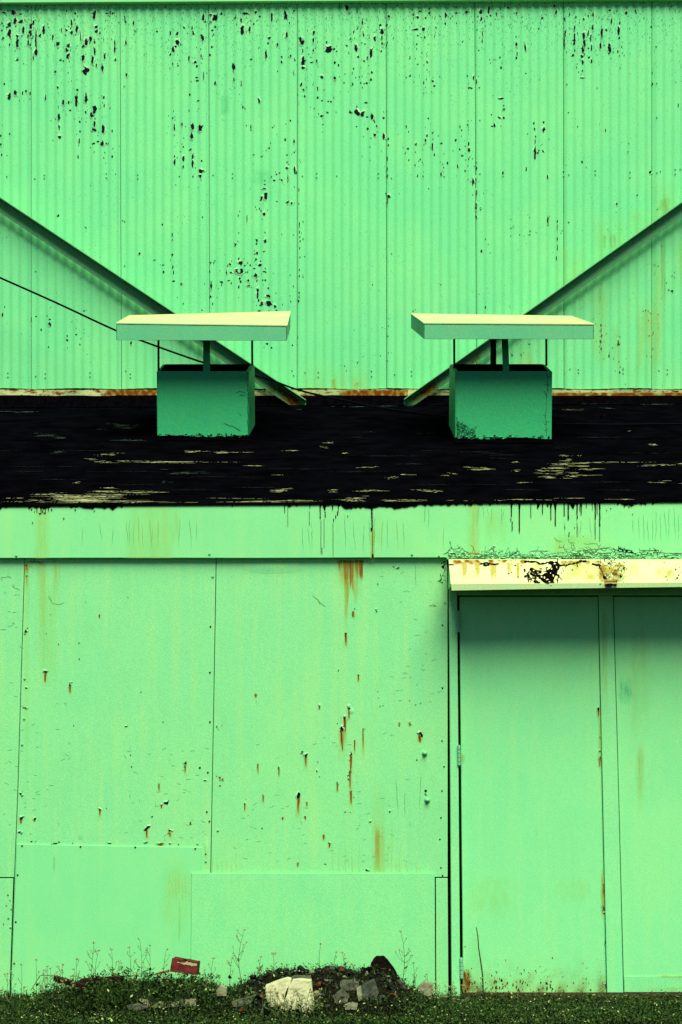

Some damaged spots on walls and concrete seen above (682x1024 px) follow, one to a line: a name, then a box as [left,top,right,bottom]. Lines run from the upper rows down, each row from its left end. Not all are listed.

peeling [0,5,142,164]
peeling [156,5,399,125]
peeling [538,3,641,78]
peeling [168,110,205,187]
peeling [202,139,305,311]
corrosion [270,383,299,405]
corrosion [345,382,437,400]
damp [239,487,404,540]
damp [466,453,679,540]
corrosion [339,551,372,611]
peeling [440,545,679,587]
corrosion [463,971,495,992]